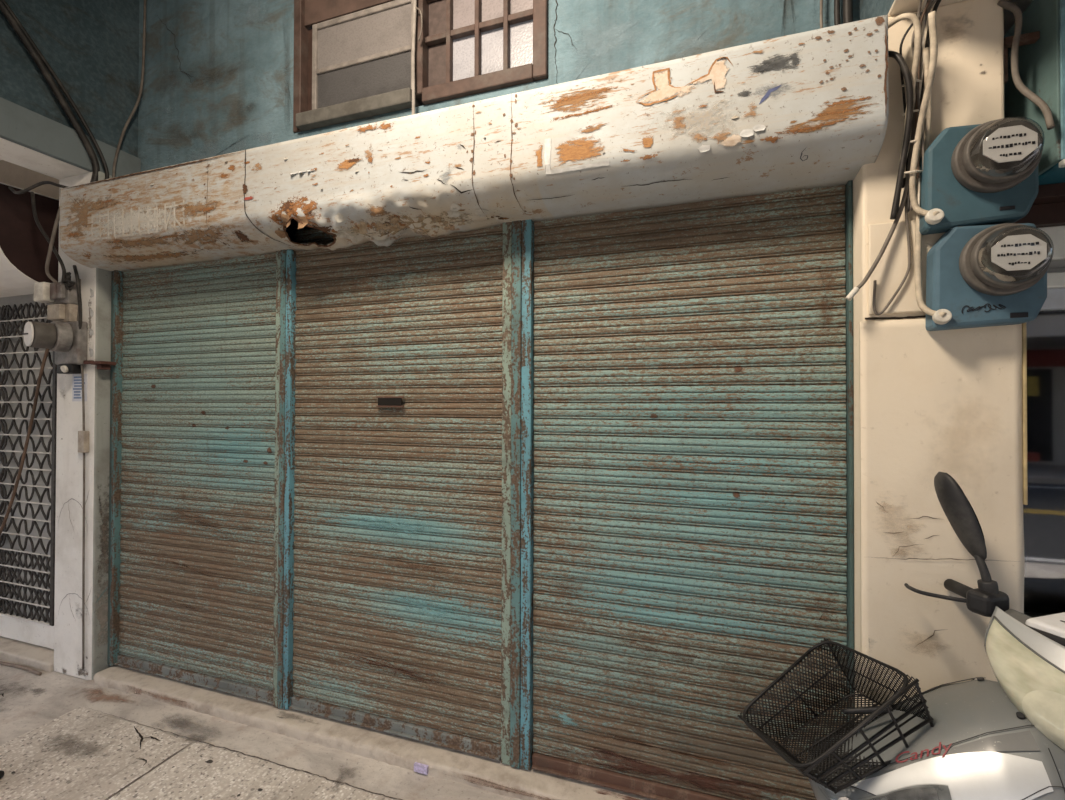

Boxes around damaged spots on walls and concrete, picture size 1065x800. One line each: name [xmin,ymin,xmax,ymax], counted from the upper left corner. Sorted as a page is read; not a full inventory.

peeling [698,124,766,153]
peeling [275,214,308,239]
crack [873,502,1019,562]
corrosion [591,751,779,799]